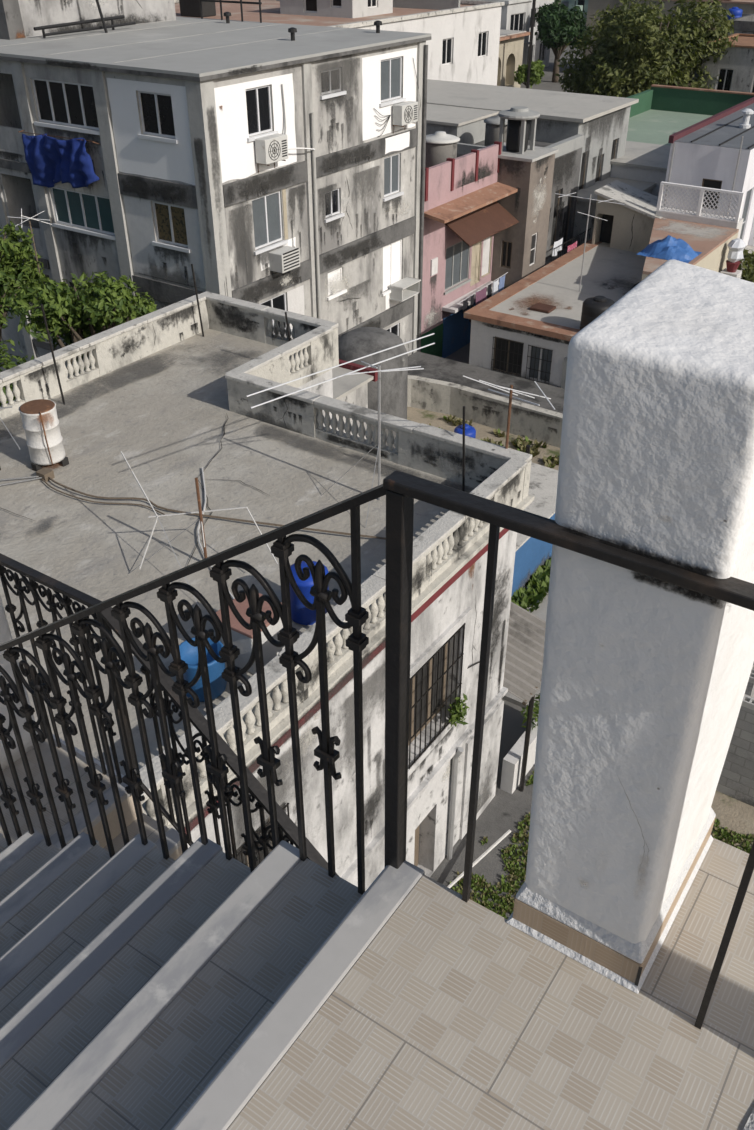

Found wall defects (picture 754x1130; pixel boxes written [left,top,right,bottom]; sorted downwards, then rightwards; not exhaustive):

water stain [50,0,158,33]
water stain [44,128,104,187]
water stain [318,58,401,267]
water stain [67,230,106,263]
water stain [121,108,304,332]
water stain [342,280,381,330]
crack [187,413,270,566]
water stain [412,562,432,594]